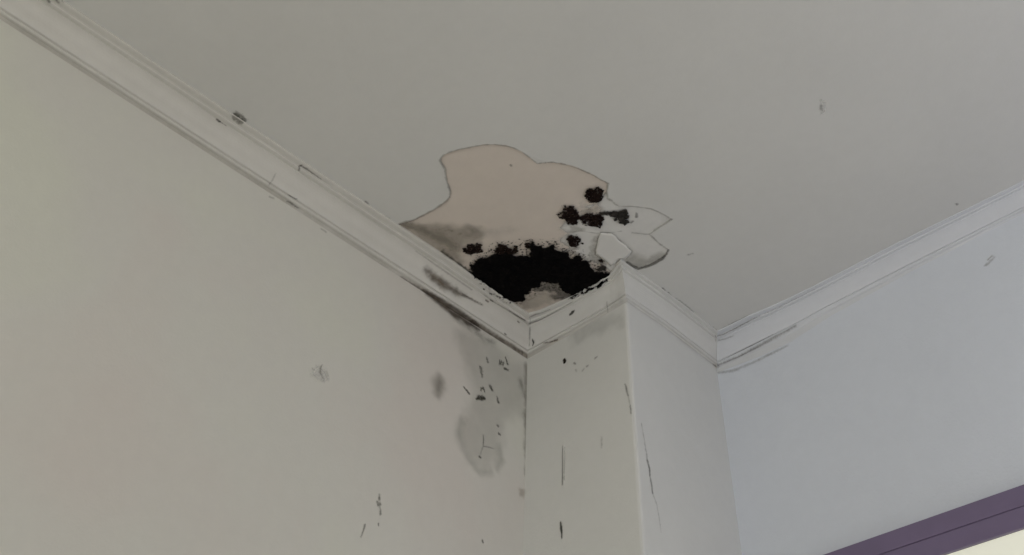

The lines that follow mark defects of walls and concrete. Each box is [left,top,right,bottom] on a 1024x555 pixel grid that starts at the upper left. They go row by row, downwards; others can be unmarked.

damp [406,271,527,356]
damp [425,186,637,303]
peeling [400,144,670,273]
peeling [514,282,566,313]